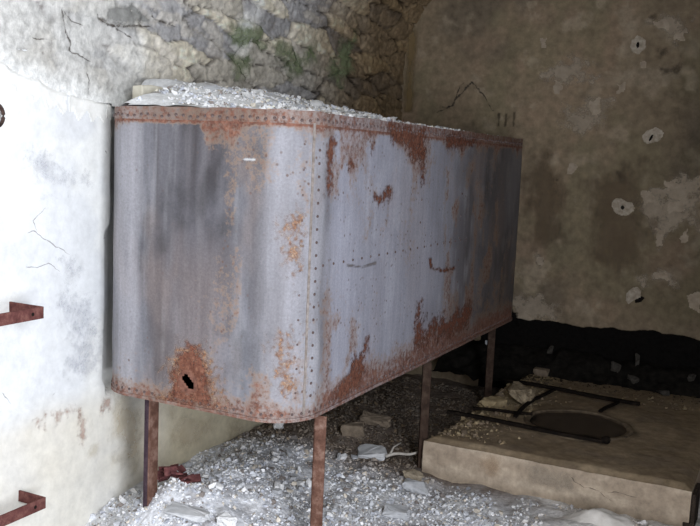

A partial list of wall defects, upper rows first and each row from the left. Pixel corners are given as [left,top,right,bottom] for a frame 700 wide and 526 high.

crack [62,11,175,90]
flaking render [0,0,432,123]
crack [438,81,491,112]
crack [28,211,66,272]
peeling [635,173,700,246]